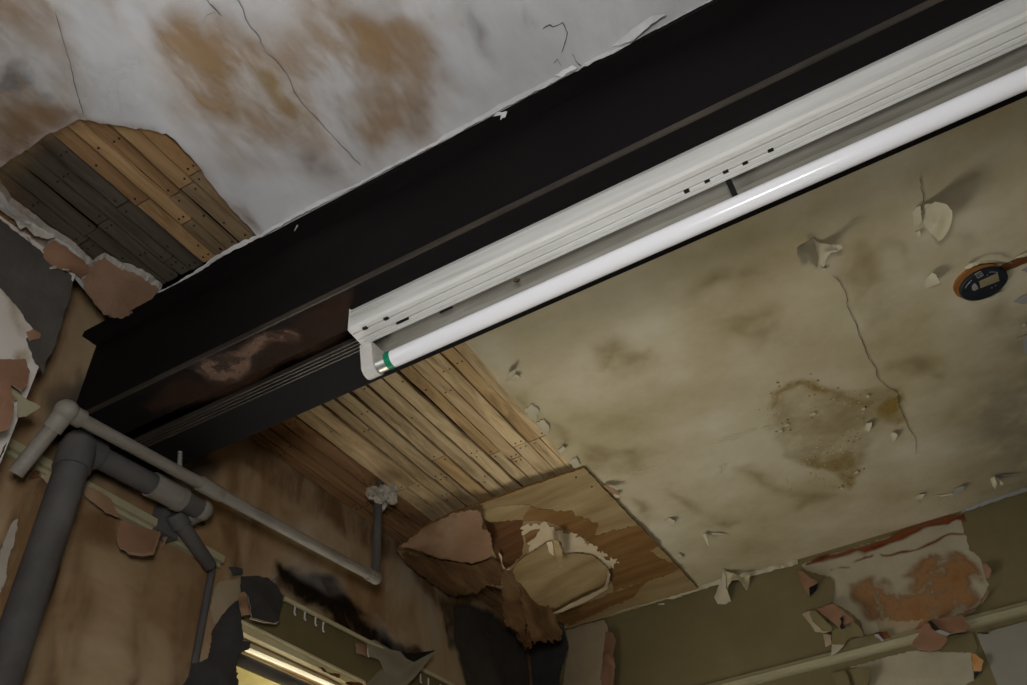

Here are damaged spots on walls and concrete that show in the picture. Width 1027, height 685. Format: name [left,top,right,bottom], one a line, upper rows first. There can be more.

water stain [159,21,239,113]
crack [199,0,359,163]
water stain [350,22,421,73]
flaking render [0,219,160,374]
peeling [912,201,953,241]
peeling [964,252,1027,272]
rust [200,333,295,381]
crack [832,275,917,454]
peeling [714,570,750,604]
flaking render [802,514,989,636]